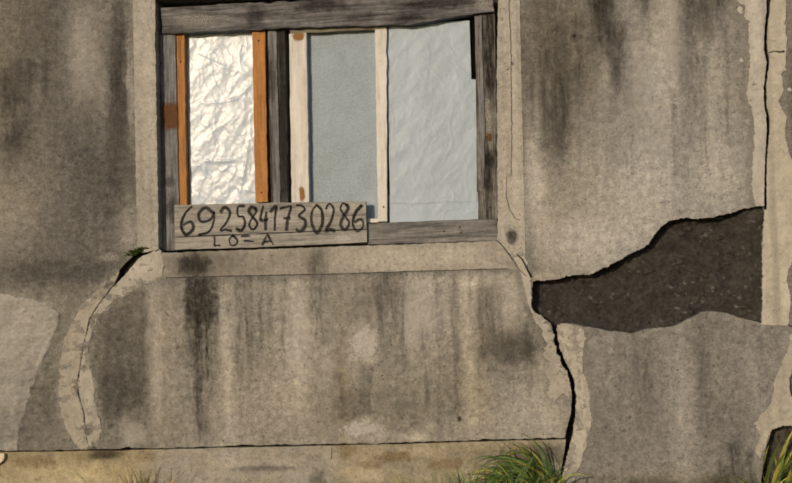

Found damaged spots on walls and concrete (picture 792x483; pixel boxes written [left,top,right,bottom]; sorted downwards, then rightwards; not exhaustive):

crack [762,0,785,209]
crack [77,247,162,441]
leakage [184,256,218,356]
crack [497,240,532,277]
crack [556,350,576,479]
spalling [532,206,765,350]